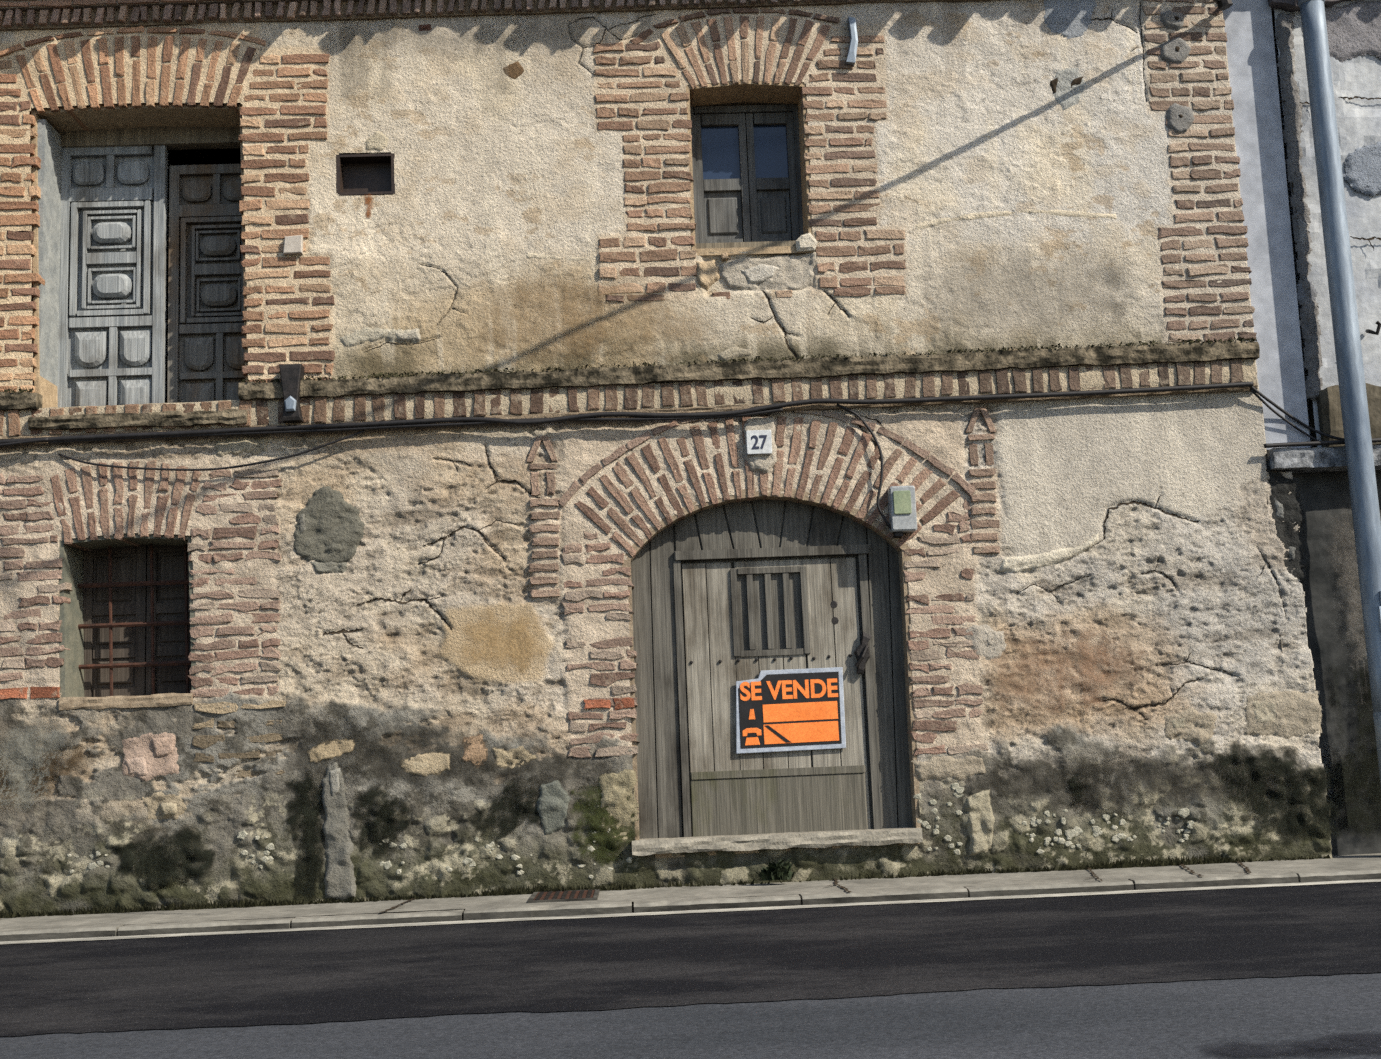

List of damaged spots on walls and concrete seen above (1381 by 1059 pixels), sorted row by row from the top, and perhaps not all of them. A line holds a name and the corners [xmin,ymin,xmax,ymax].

crack [750,290,798,358]
crack [824,291,849,317]
crack [323,445,540,649]
flaking render [1000,533,1099,573]
flaking render [964,624,1006,660]
leakage [0,725,82,804]
crack [1092,653,1238,720]
leakage [972,668,1381,842]
flaking render [1164,708,1217,746]
flaking render [1244,690,1323,739]
leakage [286,724,638,900]
mould [113,826,216,890]